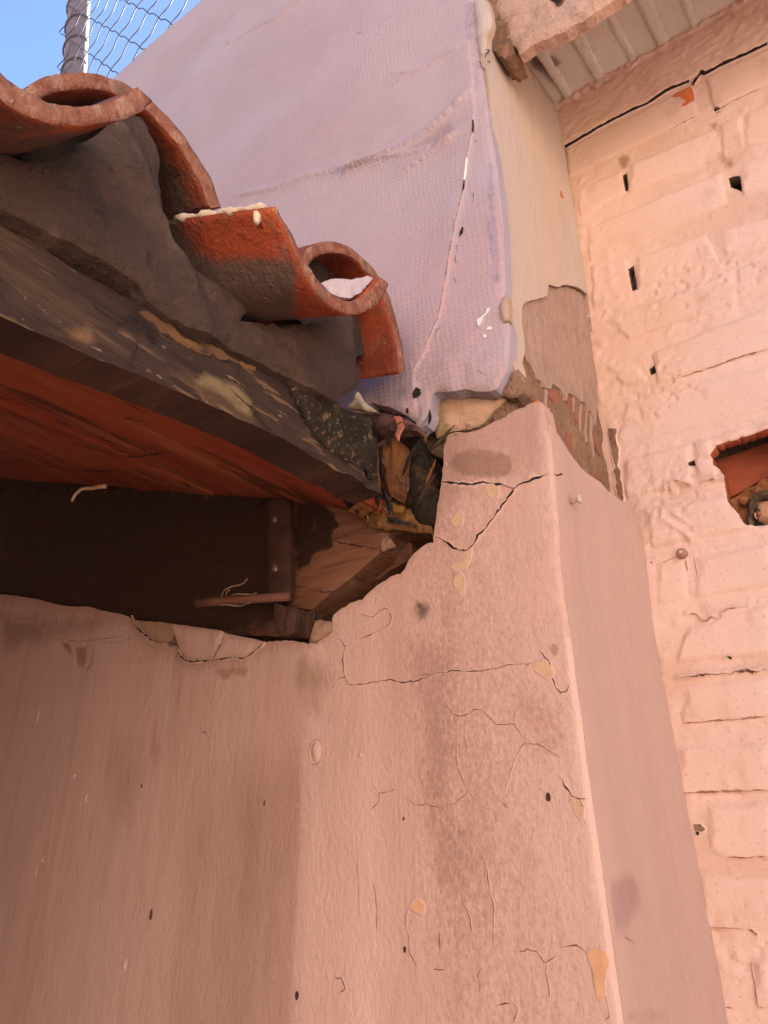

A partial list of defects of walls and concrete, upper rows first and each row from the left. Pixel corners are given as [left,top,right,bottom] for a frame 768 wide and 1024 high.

spalling [347,392,381,415]
spalling [476,286,626,502]
spalling [716,443,768,499]
crack [434,473,563,552]
peeling [131,620,263,661]
crack [131,615,266,664]
crack [332,606,587,817]
crack [405,908,444,970]
crack [462,847,586,999]
crack [335,977,346,995]
crack [477,971,519,1024]
peeling [585,945,614,1003]